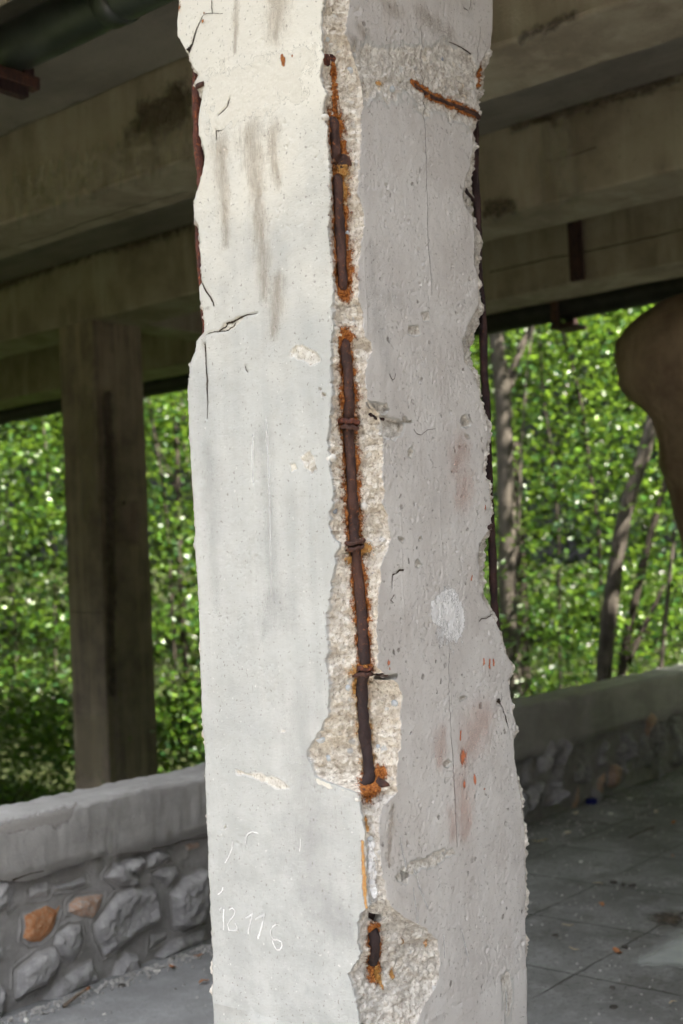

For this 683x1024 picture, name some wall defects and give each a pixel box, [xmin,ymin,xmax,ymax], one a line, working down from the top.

crack [186,0,223,53]
corrosion [323,54,360,304]
corrosion [410,78,479,121]
crack [202,283,257,415]
spalling [188,0,519,1024]
corrosion [337,326,390,803]
corrosion [361,817,395,990]
spalling [517,775,530,918]